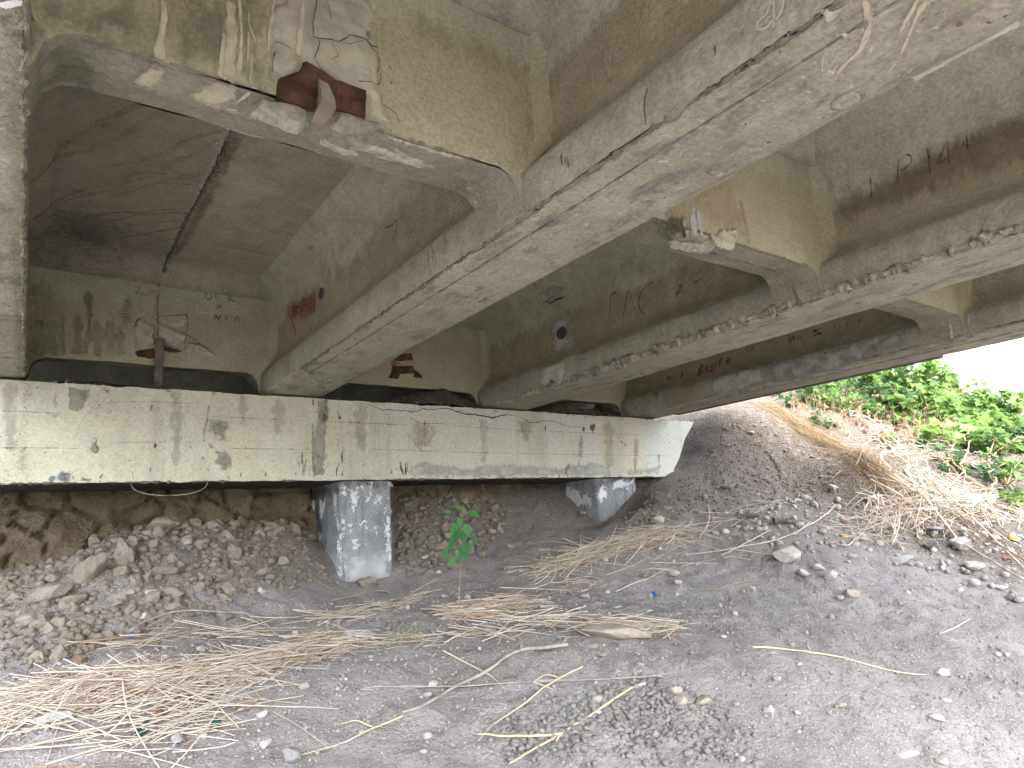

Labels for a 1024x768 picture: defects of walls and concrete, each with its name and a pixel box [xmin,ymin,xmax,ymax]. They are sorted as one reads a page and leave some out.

crack [272,0,399,120]
spalling [249,99,311,135]
corrosion [275,61,366,119]
spalling [324,112,386,149]
crack [163,130,237,274]
spalling [666,228,738,254]
water stain [69,388,87,411]
water stain [203,406,231,470]
water stain [291,344,327,476]
crack [344,399,572,427]